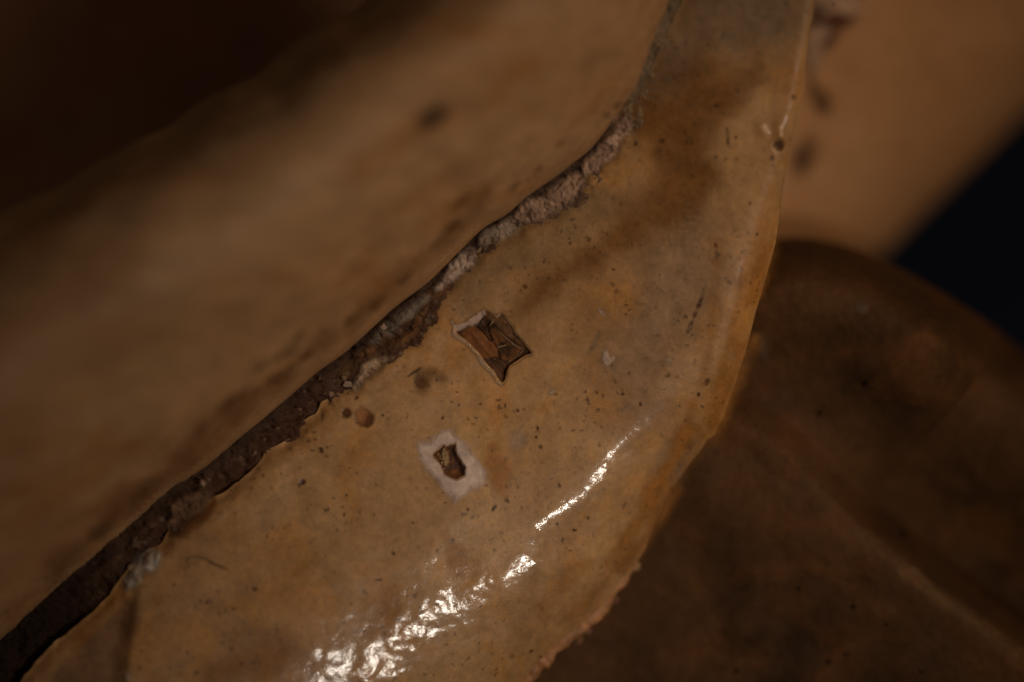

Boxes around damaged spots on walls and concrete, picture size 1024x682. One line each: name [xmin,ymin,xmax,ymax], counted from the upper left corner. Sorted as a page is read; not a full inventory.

spalling [450,308,534,386]